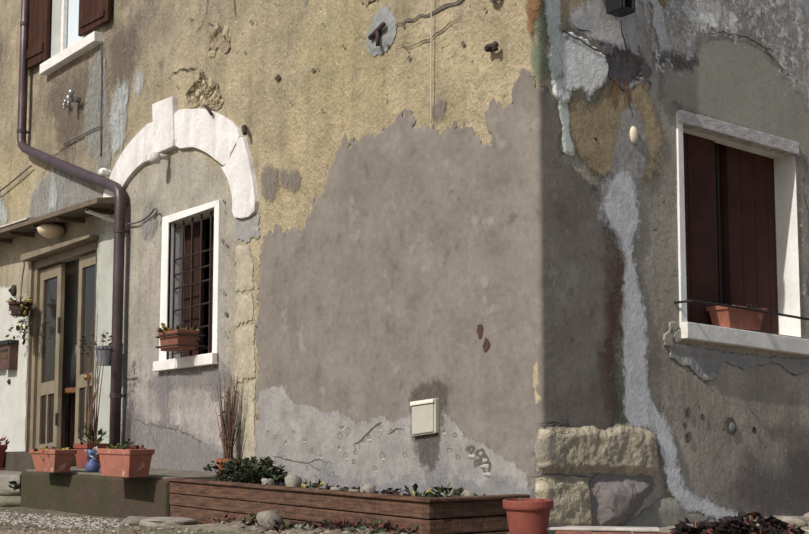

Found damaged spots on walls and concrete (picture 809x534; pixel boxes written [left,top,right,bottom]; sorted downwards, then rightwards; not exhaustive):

spalling [208,12,231,58]
crack [395,0,462,48]
peeling [549,0,809,104]
spalling [186,69,225,111]
water stain [596,104,746,521]
spalling [663,321,809,383]
peeling [254,384,532,497]